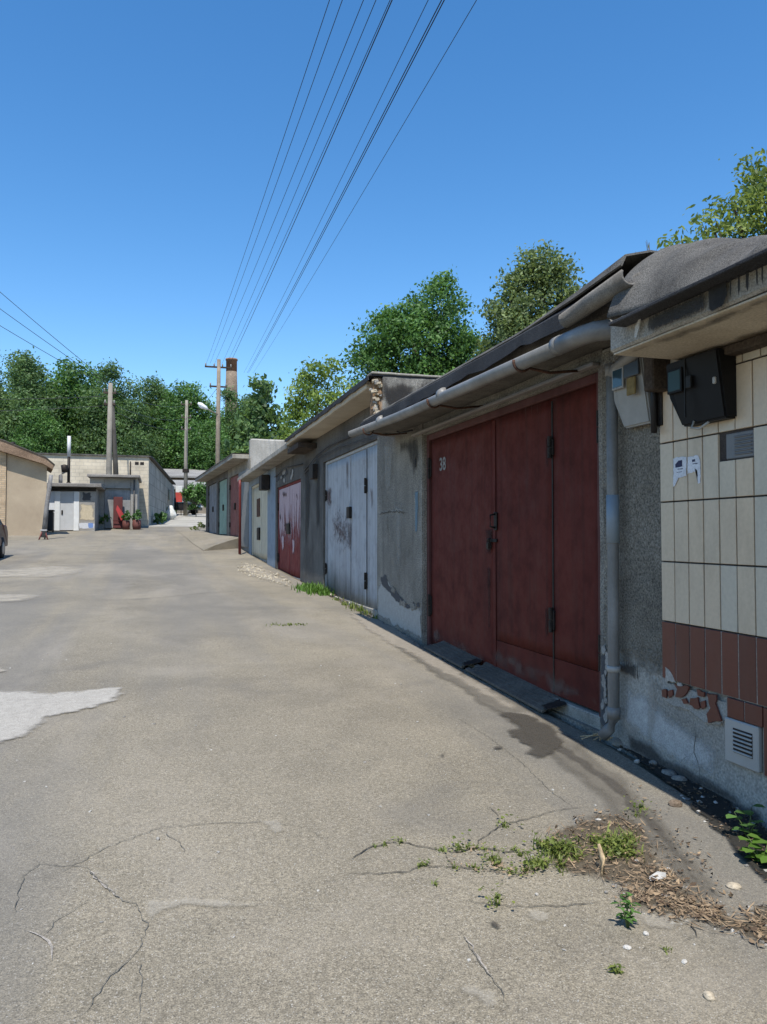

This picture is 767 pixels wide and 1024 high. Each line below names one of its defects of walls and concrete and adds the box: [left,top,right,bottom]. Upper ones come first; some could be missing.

peeling [276,469,301,552]
spalling [378,575,421,638]
spalling [662,667,727,725]
crack [353,841,557,874]
crack [14,821,292,1020]